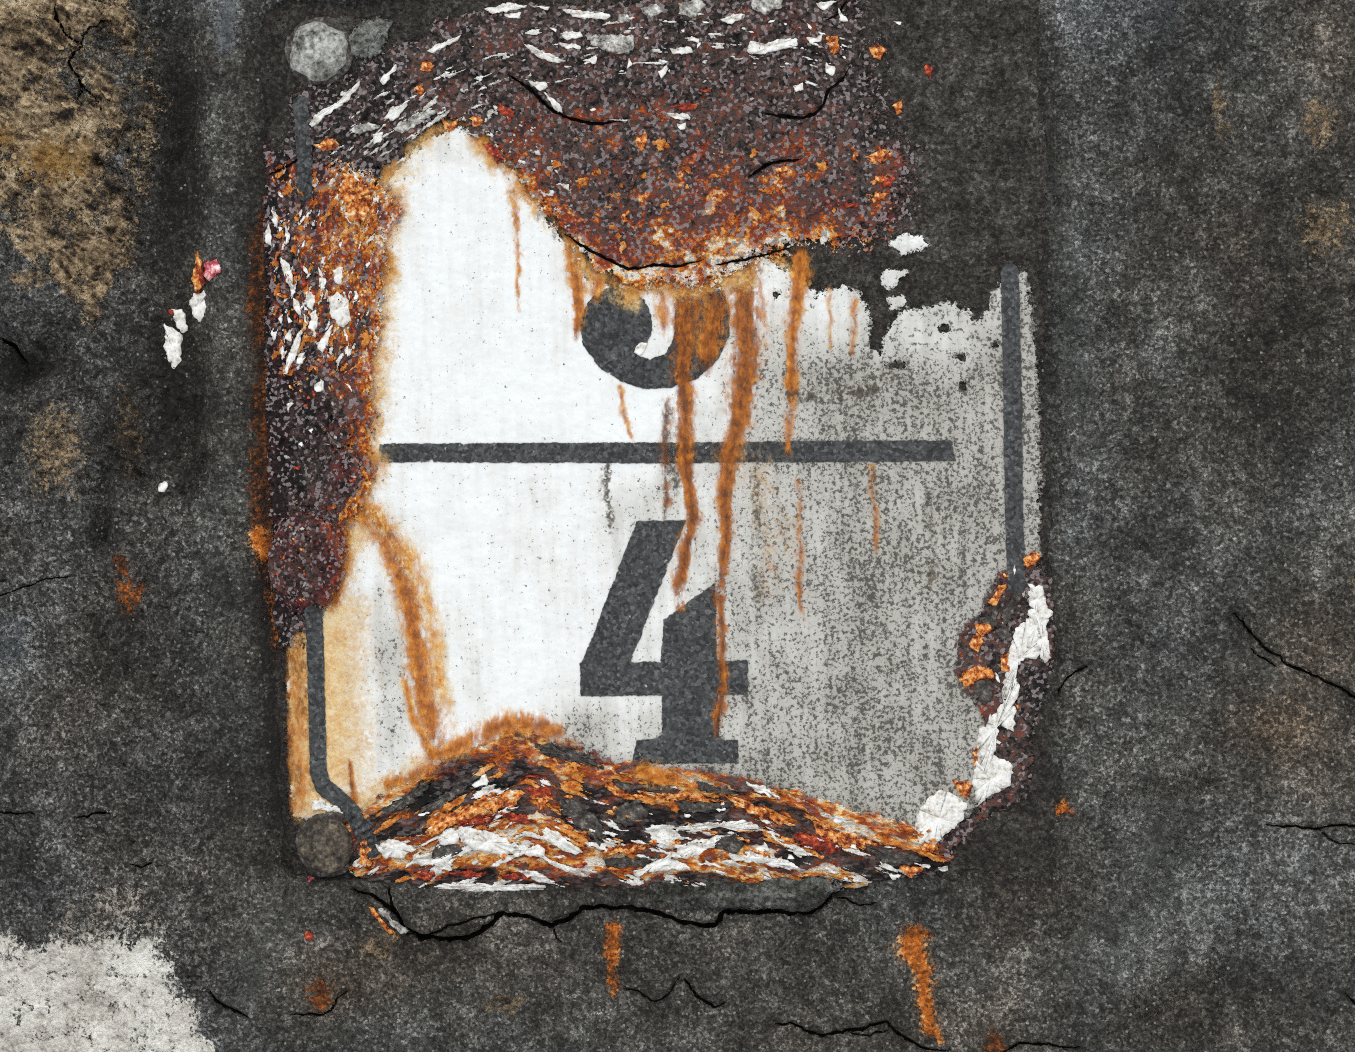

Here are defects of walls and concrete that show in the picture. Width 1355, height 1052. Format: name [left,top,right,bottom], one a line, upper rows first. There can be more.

rust [246,0,954,892]
crack [0,576,72,596]
crack [1234,613,1355,698]
peeling [913,552,1057,858]
crack [1266,824,1355,845]
crack [354,885,876,943]
rust [603,920,622,996]
rust [893,925,945,1045]